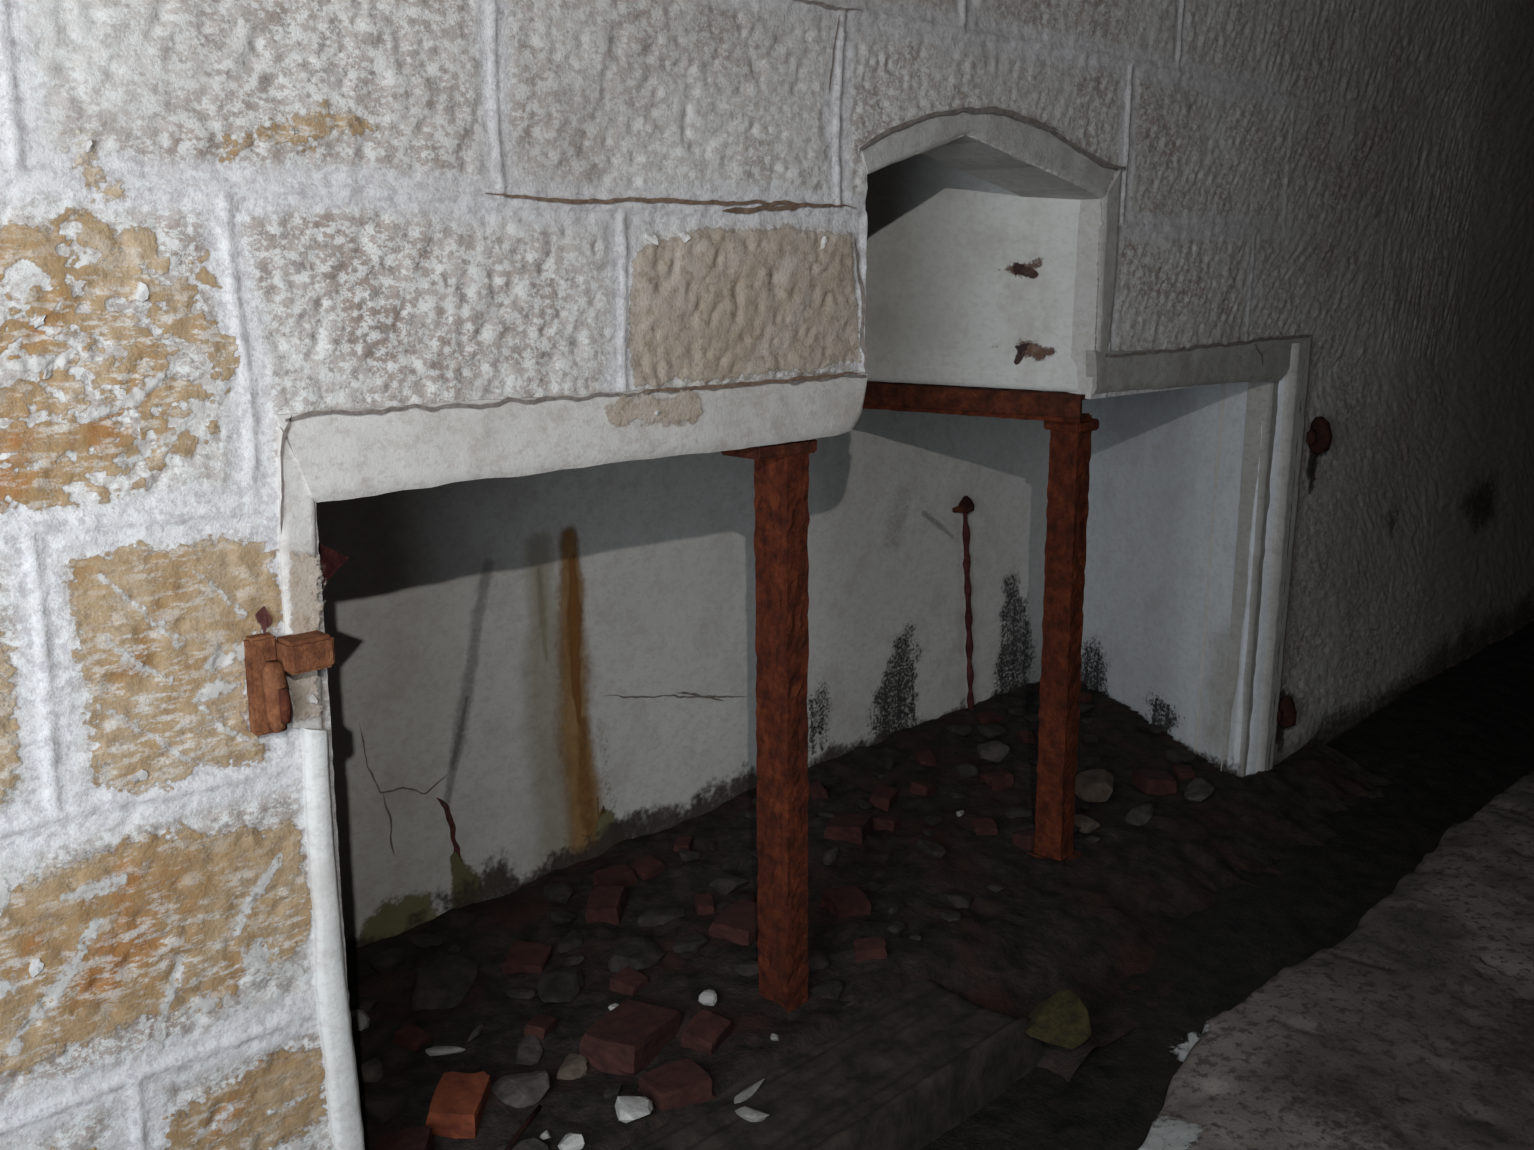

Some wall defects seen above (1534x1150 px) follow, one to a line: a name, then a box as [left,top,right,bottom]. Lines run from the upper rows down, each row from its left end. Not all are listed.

peeling [0,129,240,514]
peeling [605,223,862,427]
corrosion [1307,450,1319,494]
peeling [64,533,326,796]
corrosion [559,528,601,855]
water stain [807,625,925,767]
water stain [993,572,1035,695]
crack [360,728,462,860]
water stain [436,768,757,910]
peeling [0,819,312,1076]
water stain [345,937,383,954]
peeling [163,1046,328,1150]